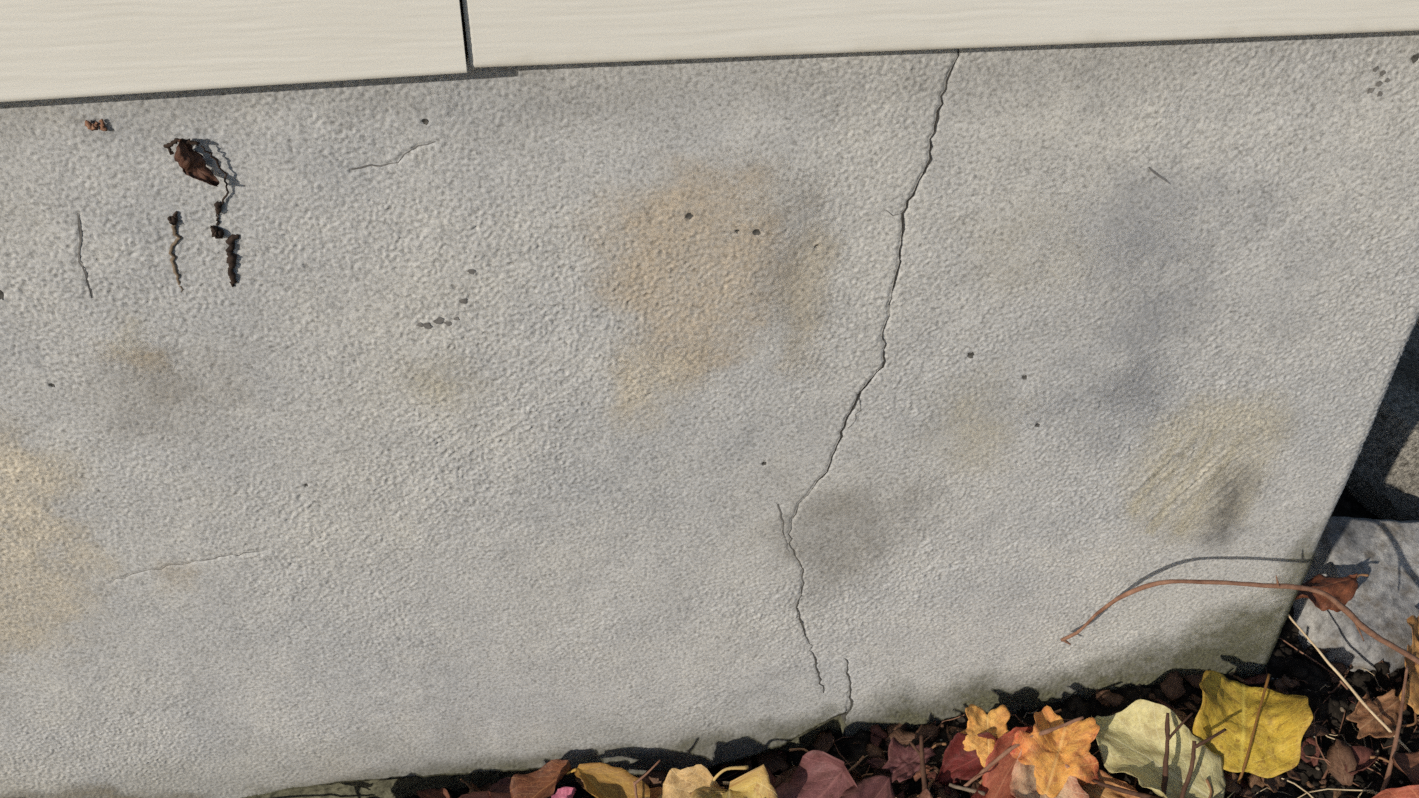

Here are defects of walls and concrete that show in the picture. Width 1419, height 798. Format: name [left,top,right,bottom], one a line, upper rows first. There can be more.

crack [777,49,959,737]